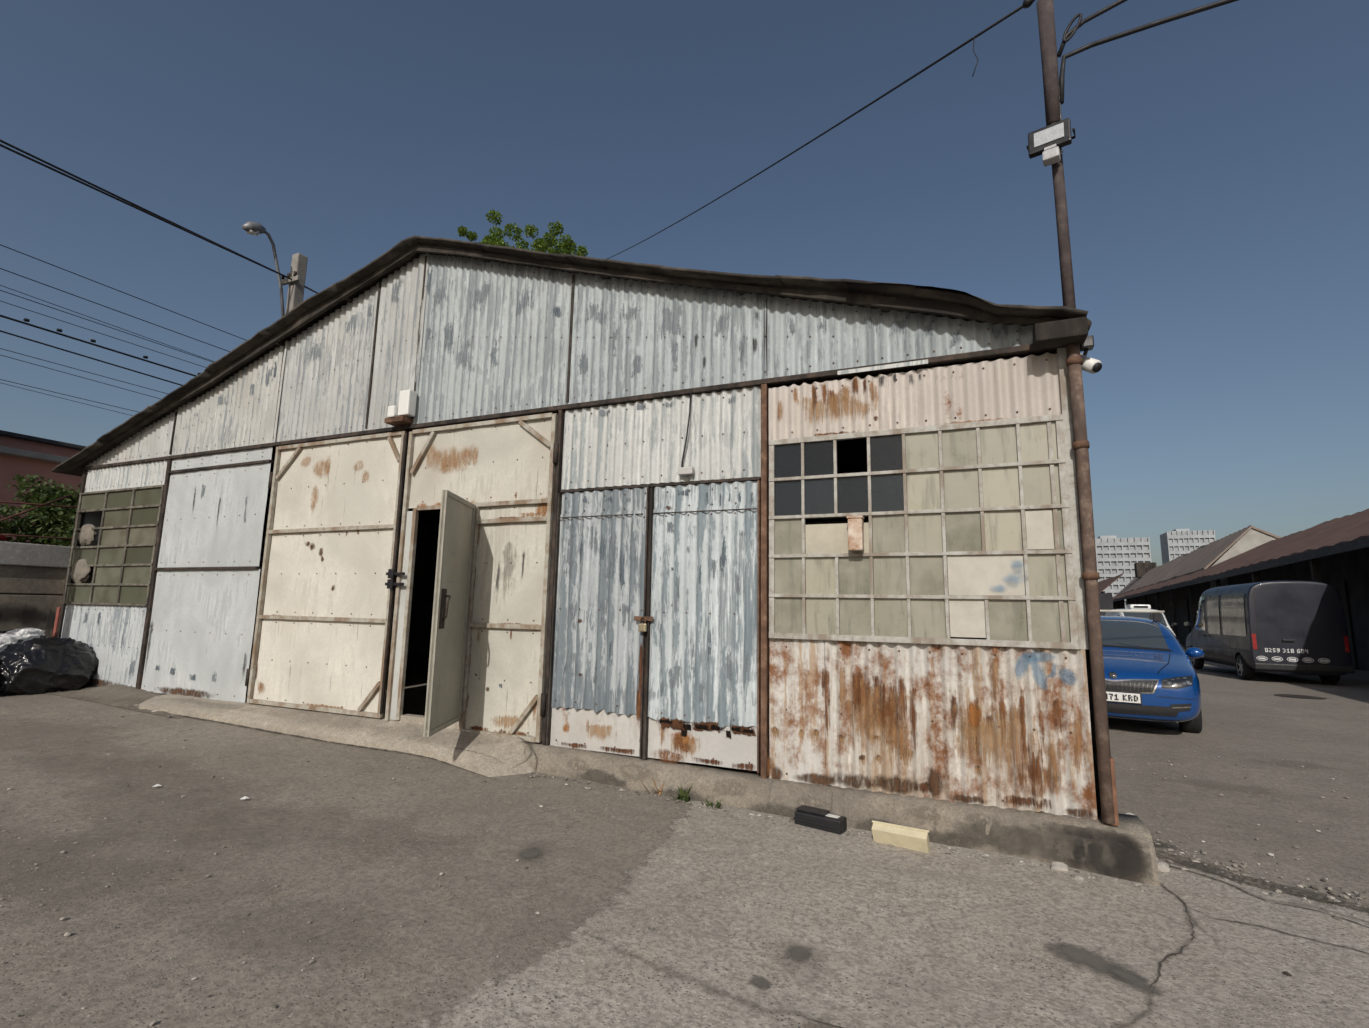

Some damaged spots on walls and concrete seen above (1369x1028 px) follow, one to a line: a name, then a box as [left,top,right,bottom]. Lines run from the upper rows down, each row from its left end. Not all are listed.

corrosion [777,376,877,436]
corrosion [561,712,634,754]
corrosion [659,638,1098,820]